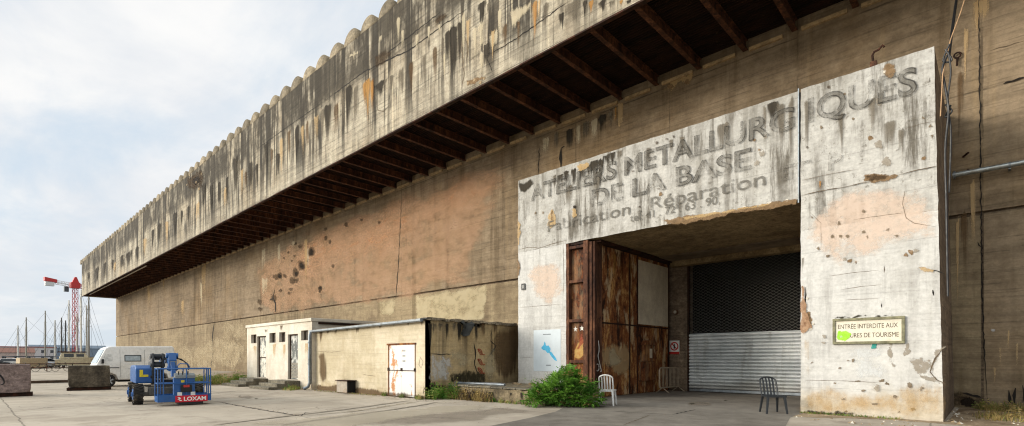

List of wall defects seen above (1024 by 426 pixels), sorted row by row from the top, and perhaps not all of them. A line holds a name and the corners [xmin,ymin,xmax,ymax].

damp [544,0,631,29]
rust [363,78,373,106]
damp [87,1,530,282]
spalling [864,136,898,183]
damp [869,98,904,150]
spalling [664,199,797,224]
spalling [258,242,315,311]
damp [408,322,461,344]
damp [475,324,518,377]
spalling [800,286,826,344]